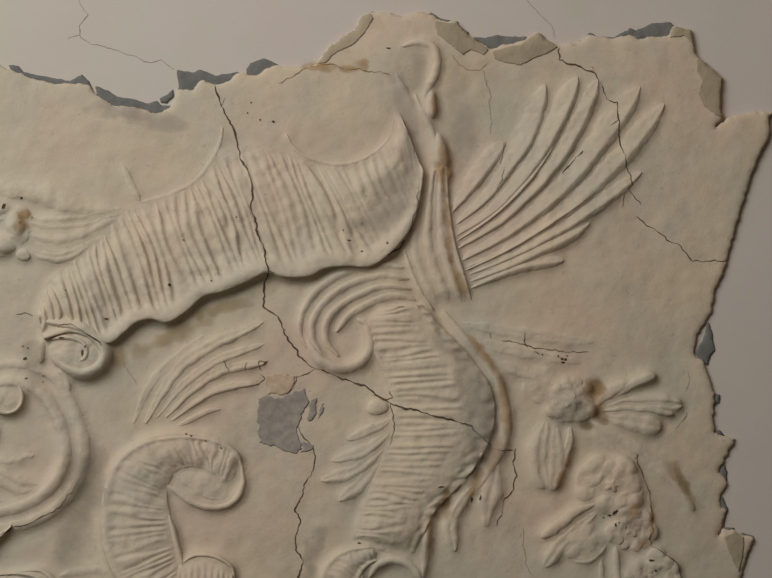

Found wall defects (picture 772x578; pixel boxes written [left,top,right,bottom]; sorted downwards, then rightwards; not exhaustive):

crack [69,2,173,69]
flaking render [429,12,557,65]
peeling [607,22,693,43]
peeling [9,58,277,113]
flaking render [696,59,722,117]
crack [452,54,506,191]
crack [527,0,726,262]
crack [215,87,517,522]
peeling [307,398,324,421]
crack [294,427,316,578]
crack [637,455,681,577]